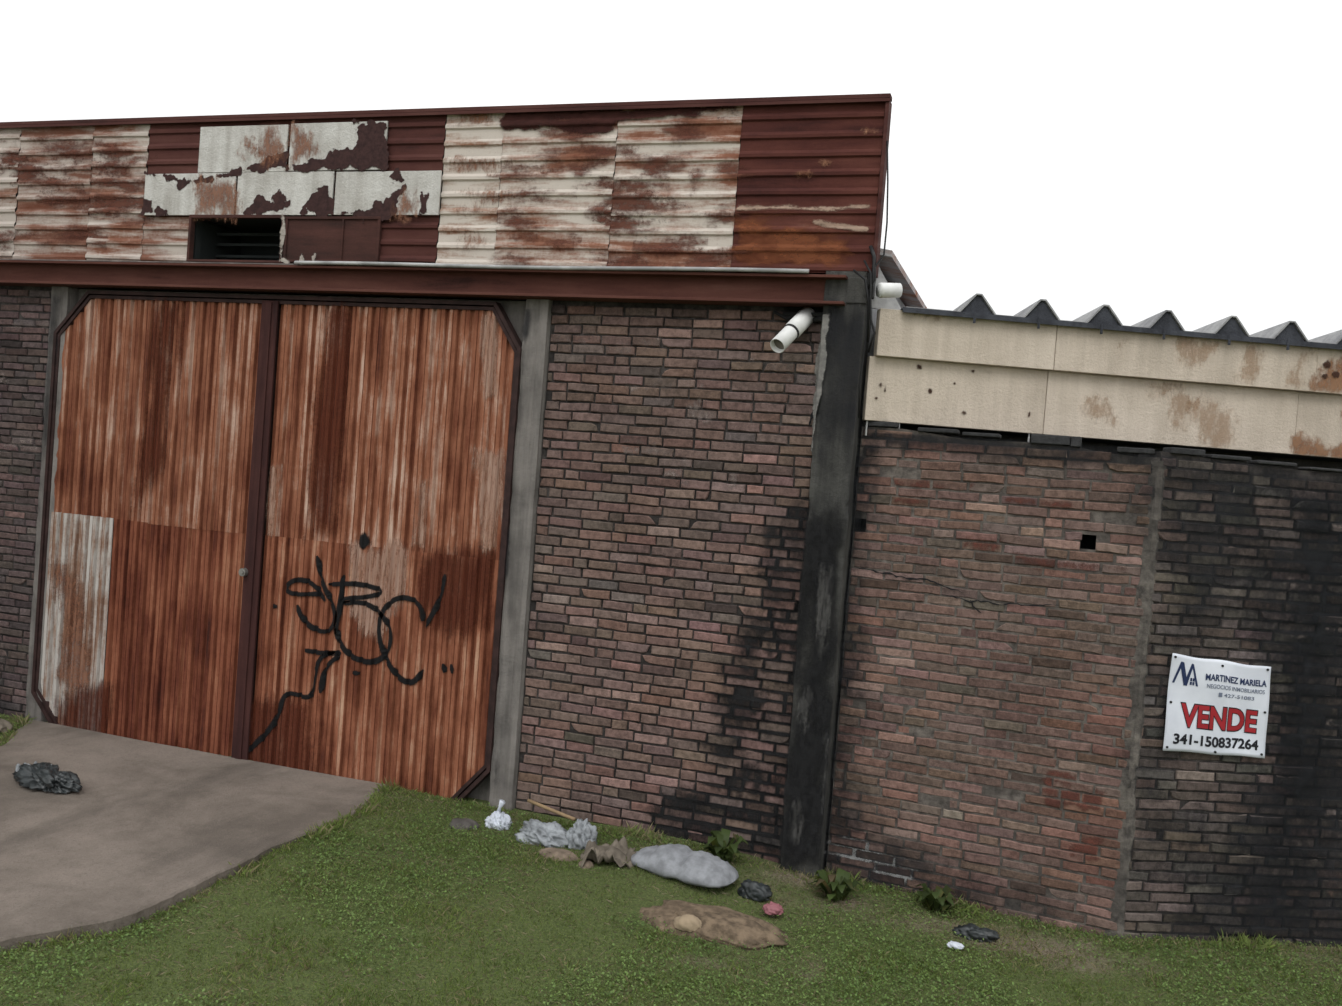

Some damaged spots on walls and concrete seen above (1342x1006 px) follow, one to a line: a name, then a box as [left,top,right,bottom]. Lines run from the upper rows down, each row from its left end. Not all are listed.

rust [0,137,152,250]
peeling [141,119,429,265]
rust [131,299,184,512]
rust [268,466,283,536]
rust [304,306,353,539]
rust [349,447,504,641]
rust [480,315,497,398]
rust [1291,431,1342,458]
rust [1309,359,1342,392]
rust [51,564,114,733]
water stain [643,305,1342,948]
rust [248,696,315,771]